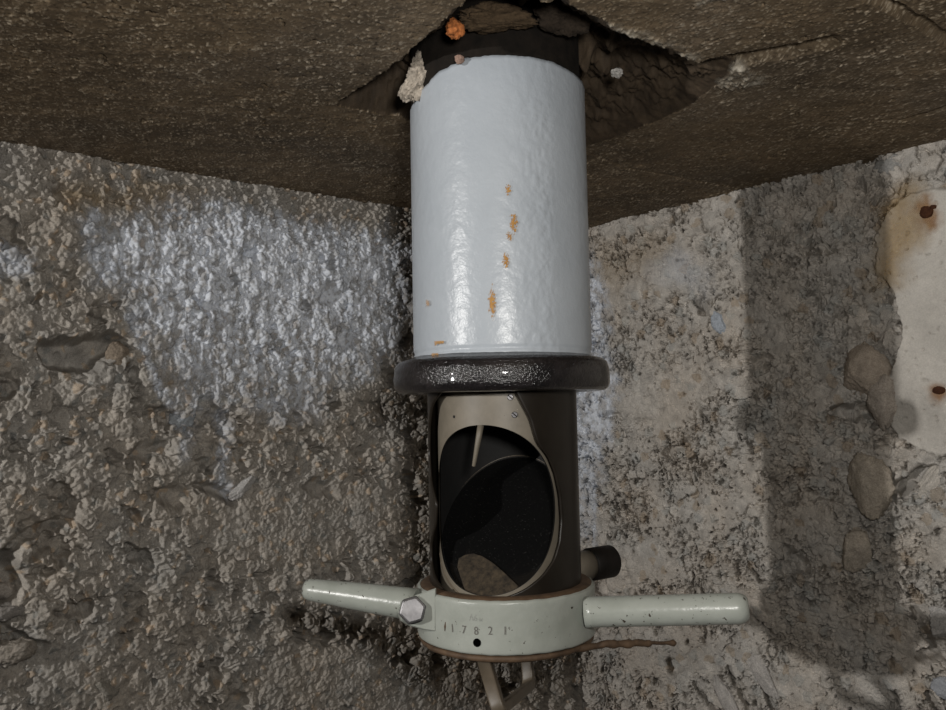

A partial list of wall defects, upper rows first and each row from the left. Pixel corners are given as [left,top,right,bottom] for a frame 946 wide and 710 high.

spalling [335,0,737,147]
rust [883,202,936,276]
rust [932,386,946,399]